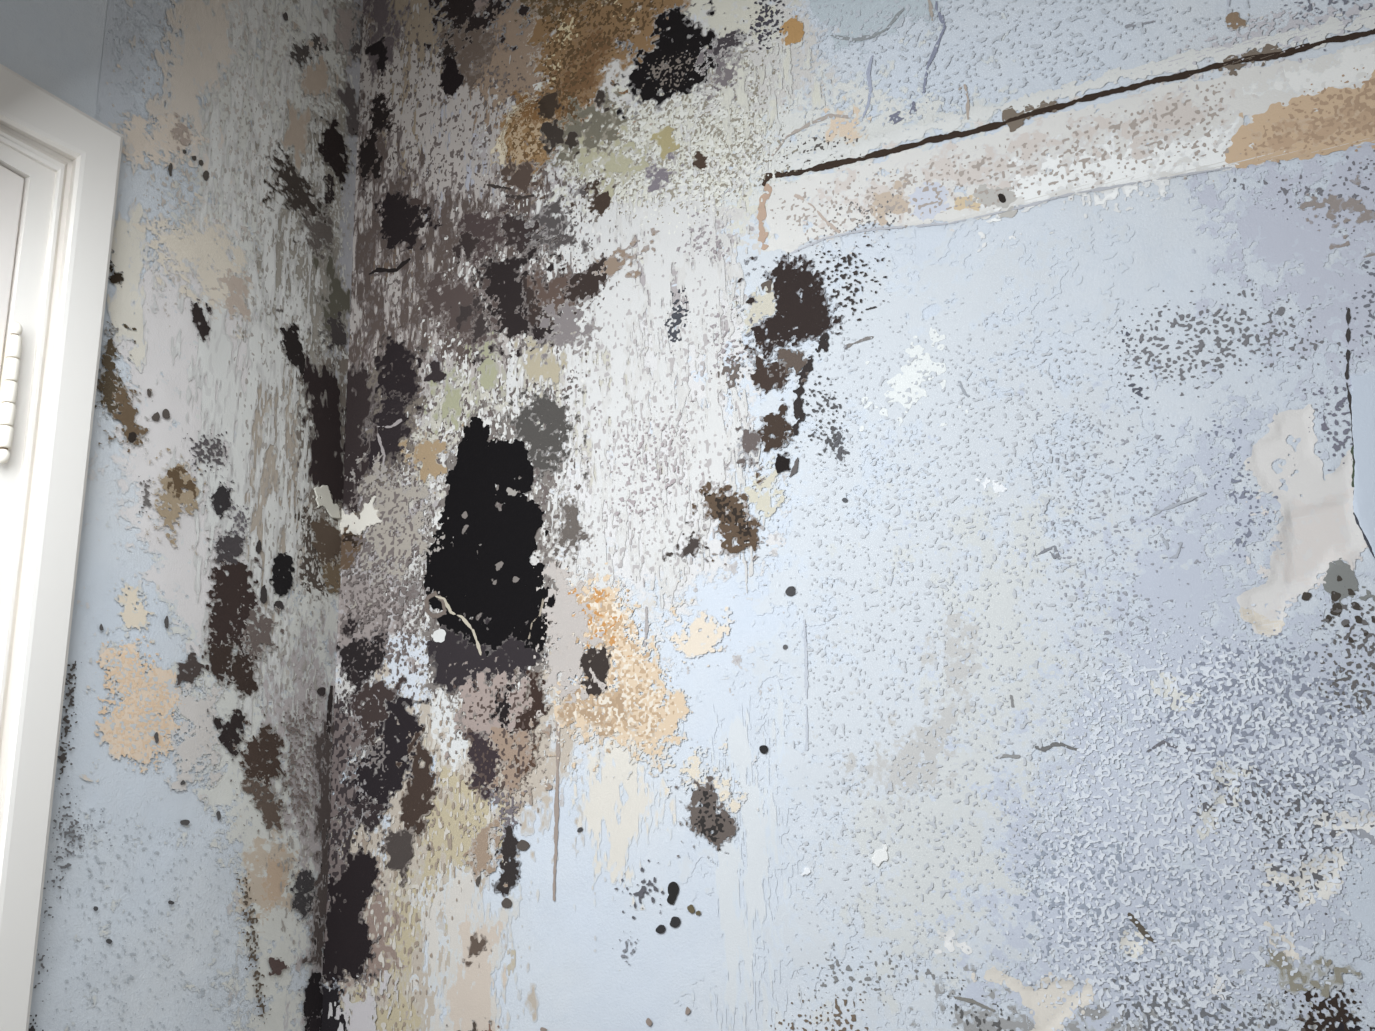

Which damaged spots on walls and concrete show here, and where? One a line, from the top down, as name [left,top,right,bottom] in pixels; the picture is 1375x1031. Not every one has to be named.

leakage [95,0,172,134]
crack [762,0,1375,254]
leakage [108,249,124,287]
crack [1345,308,1375,558]
peeling [79,572,234,806]
leakage [43,661,151,1029]
leakage [158,819,205,872]